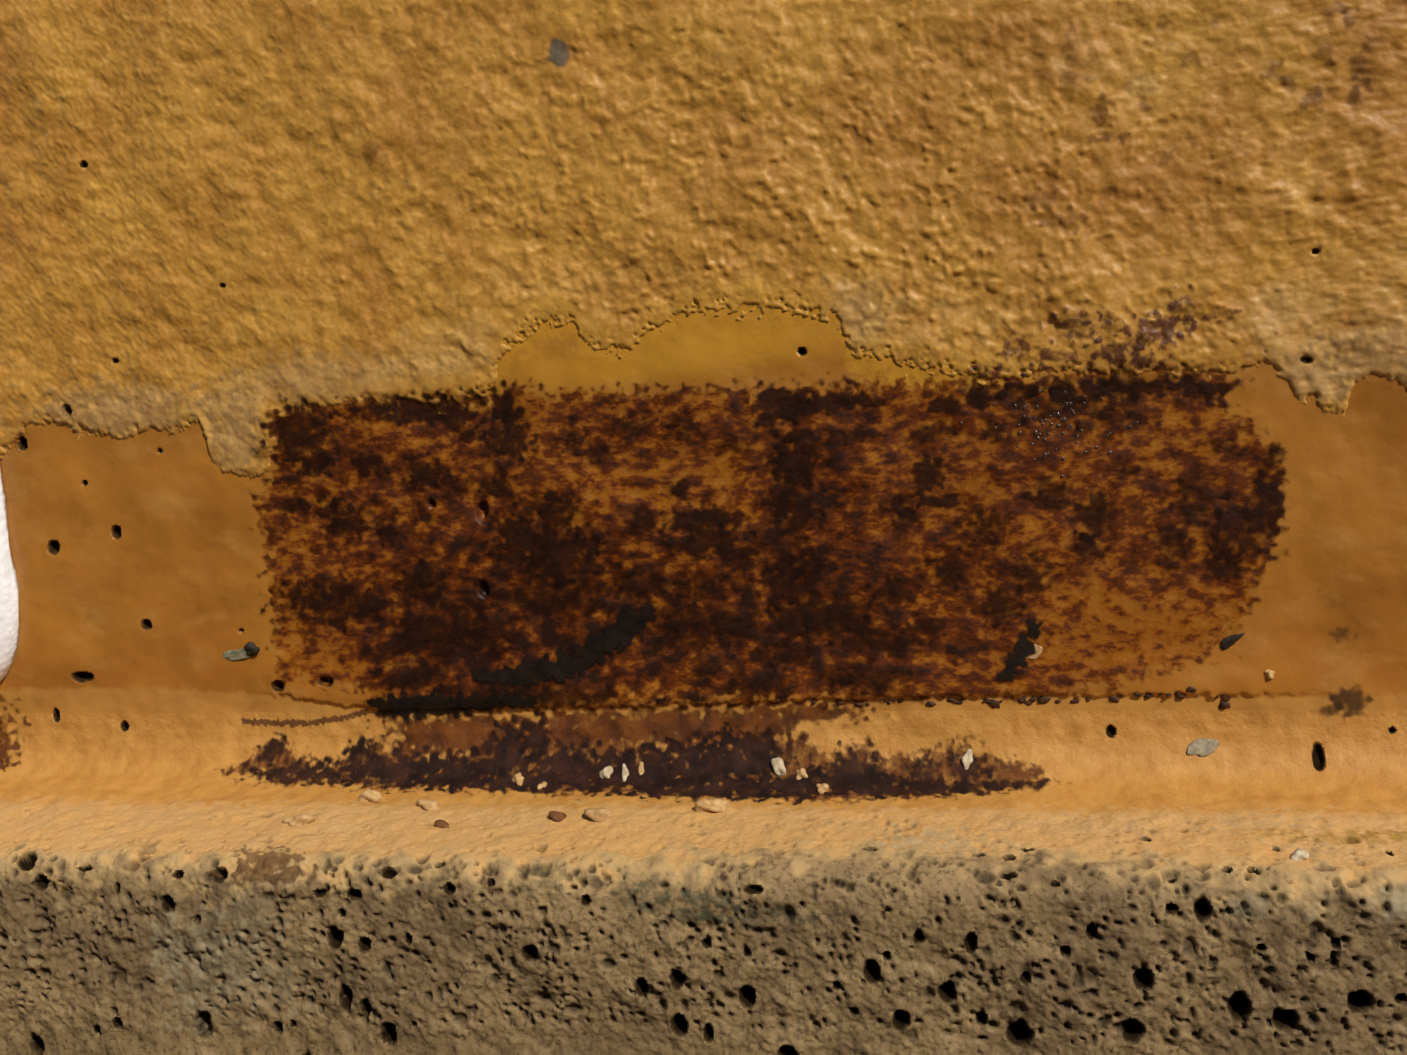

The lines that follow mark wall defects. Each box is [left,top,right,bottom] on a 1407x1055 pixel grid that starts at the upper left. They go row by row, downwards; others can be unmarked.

spalling [1299,355,1314,365]
spalling [60,402,73,418]
spalling [14,435,28,452]
spalling [110,524,122,541]
spalling [46,537,61,558]
corrosion [222,284,1289,805]
spalling [139,619,154,632]
peeling [222,628,260,661]
peeling [1025,644,1042,659]
peeling [1221,633,1245,650]
spalling [68,671,97,684]
spalling [1105,724,1117,739]